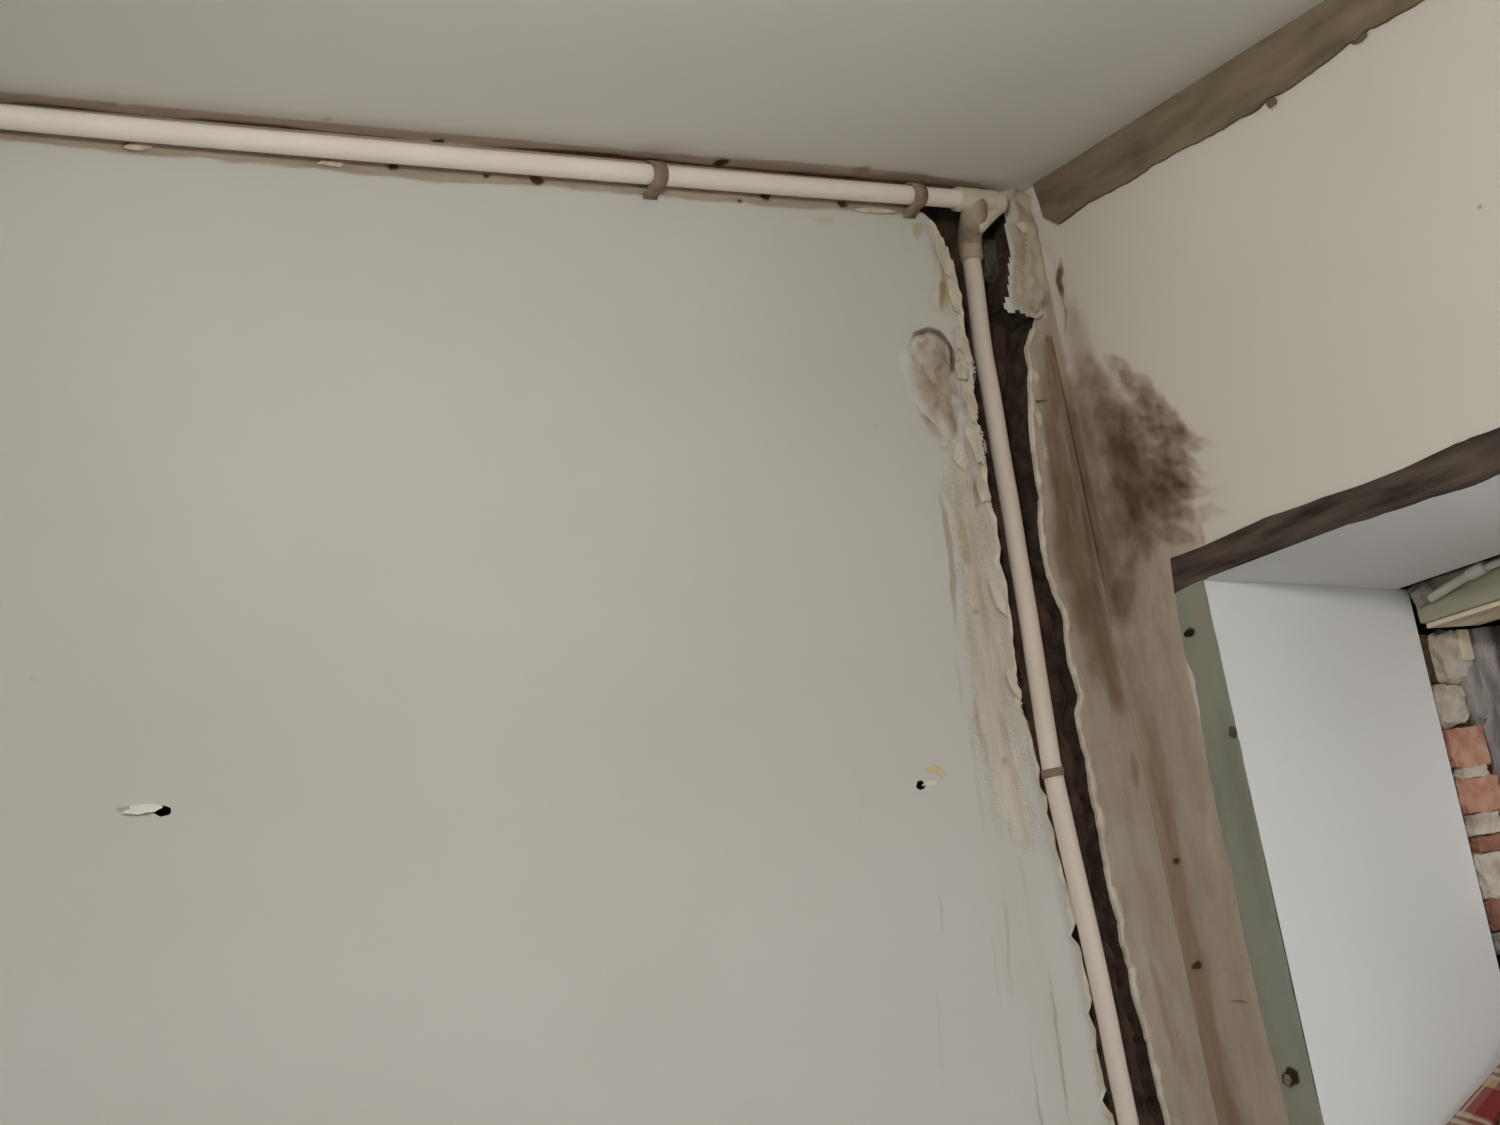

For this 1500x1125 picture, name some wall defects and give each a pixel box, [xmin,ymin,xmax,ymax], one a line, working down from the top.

peeling [926,221,1047,858]